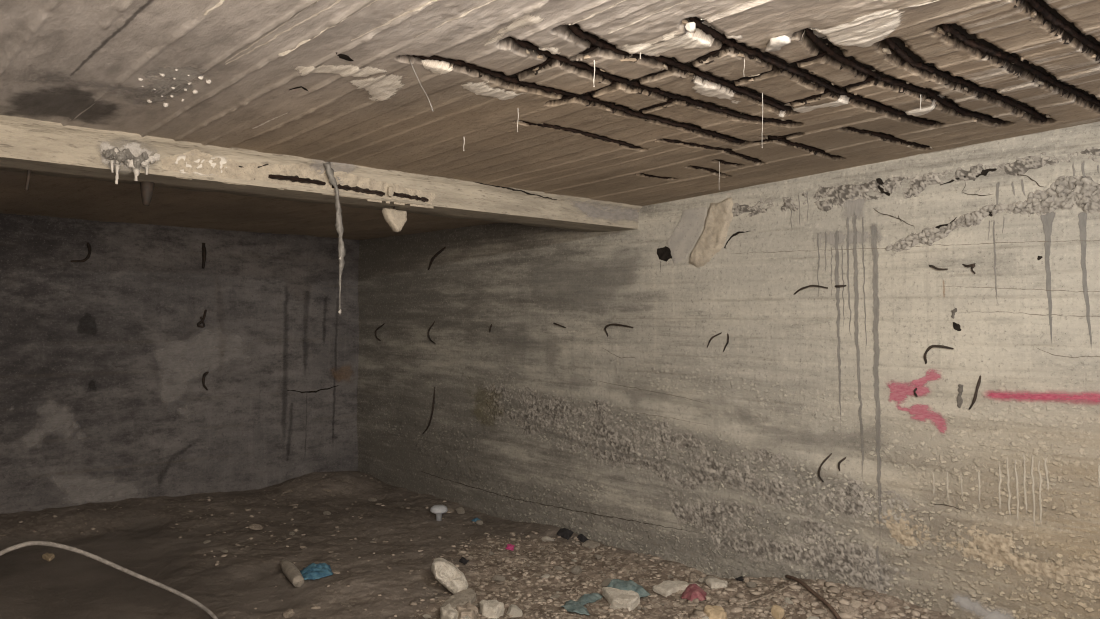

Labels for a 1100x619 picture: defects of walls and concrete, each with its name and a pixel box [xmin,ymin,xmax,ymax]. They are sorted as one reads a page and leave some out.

spalling [412,17,1051,174]
spalling [937,23,1100,108]
spalling [1014,0,1100,63]
water stain [100,142,160,184]
spalling [657,147,1100,268]
water stain [1041,212,1055,340]
water stain [1078,212,1092,344]
water stain [817,197,881,524]